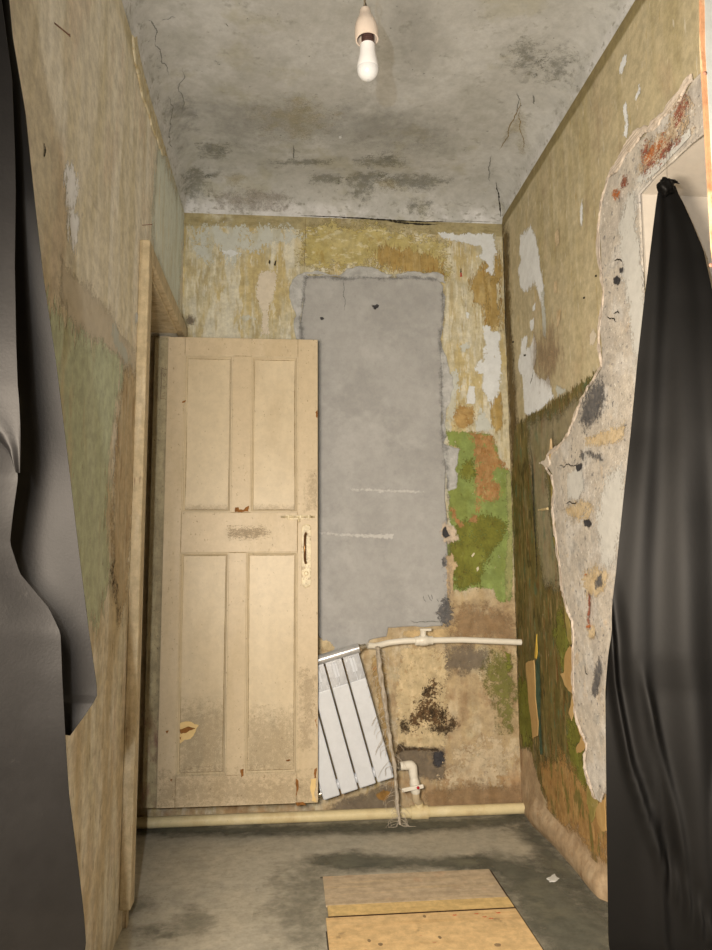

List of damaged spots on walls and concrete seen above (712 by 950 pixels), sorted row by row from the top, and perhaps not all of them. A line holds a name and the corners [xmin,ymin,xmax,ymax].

crack [149,17,185,147]
crack [467,95,535,222]
peeling [240,269,278,336]
crack [302,215,443,264]
peeling [438,232,498,276]
peeling [518,223,565,416]
peeling [423,325,514,603]
flaking render [538,73,704,832]
damp [136,368,610,950]